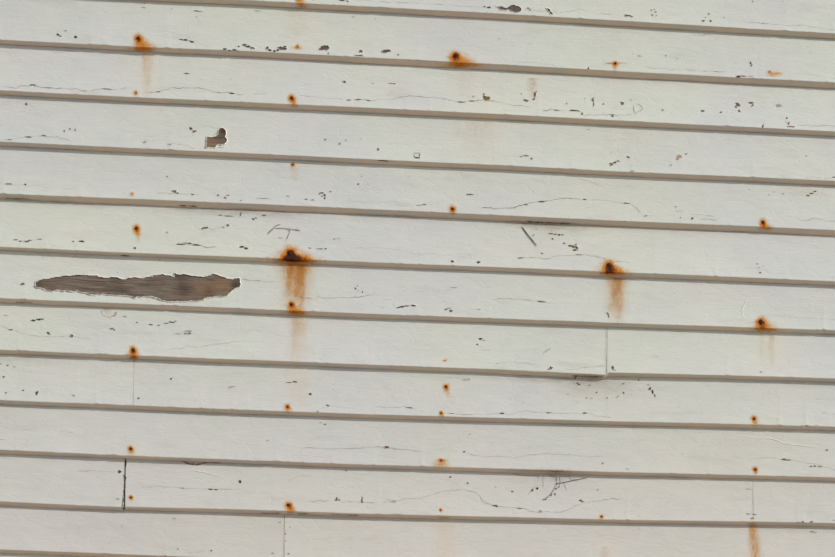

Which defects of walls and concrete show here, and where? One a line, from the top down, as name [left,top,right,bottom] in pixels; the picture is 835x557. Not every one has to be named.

corrosion [134,34,152,52]
corrosion [449,51,477,68]
peeling [205,127,228,149]
peeling [20,272,242,303]
corrosion [275,247,315,315]
corrosion [601,260,624,296]
corrosion [755,317,776,331]